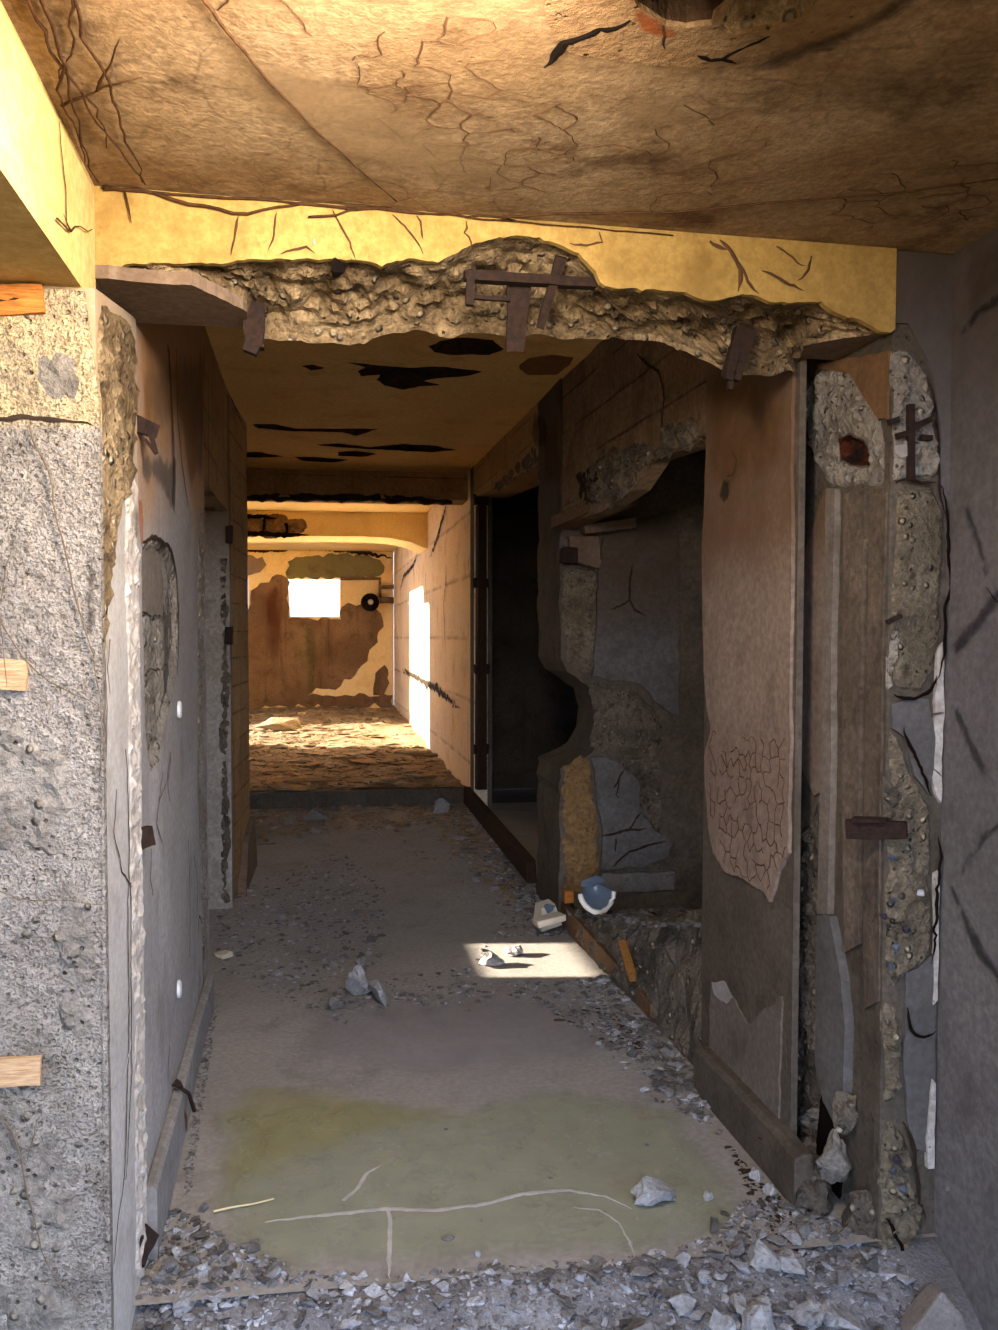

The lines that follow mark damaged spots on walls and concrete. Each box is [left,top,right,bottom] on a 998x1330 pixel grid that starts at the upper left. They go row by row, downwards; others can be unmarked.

spalling [638,0,815,30]
crack [352,16,770,215]
crack [59,122,67,230]
crack [231,216,239,254]
crack [268,212,313,254]
crack [333,211,356,259]
crack [392,214,423,253]
crack [709,240,812,294]
crack [893,383,951,796]
spalling [97,305,178,1279]
peeling [125,236,954,1252]
crack [709,730,786,889]